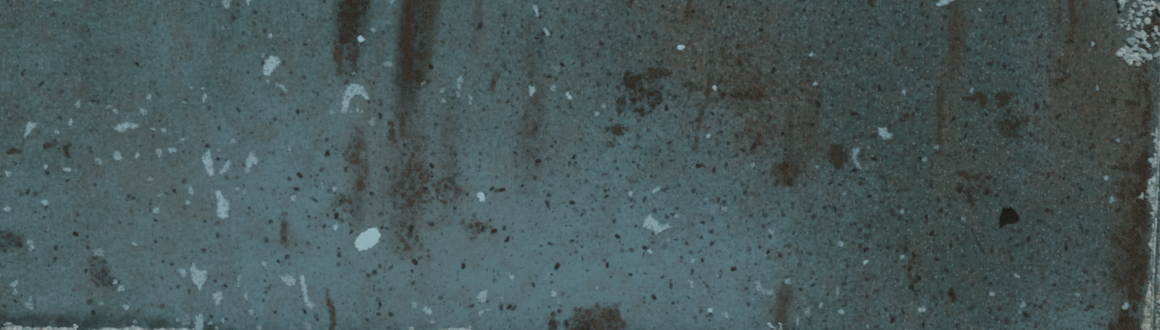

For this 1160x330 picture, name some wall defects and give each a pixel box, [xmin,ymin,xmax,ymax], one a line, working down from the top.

rust [334,0,368,75]
rust [396,0,439,95]
spalling [1114,0,1160,68]
rust [1139,16,1159,51]
peeling [629,186,679,256]
spalling [985,176,1031,246]
rust [1109,150,1151,330]
spalling [94,305,224,330]
peeling [179,264,262,330]
peeling [279,275,315,330]
spalling [412,291,516,330]
rust [548,306,625,330]